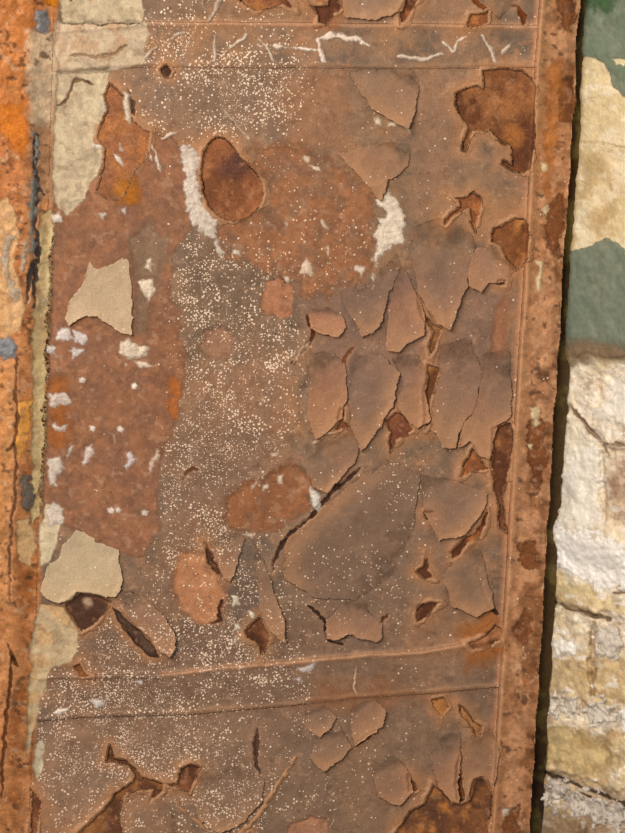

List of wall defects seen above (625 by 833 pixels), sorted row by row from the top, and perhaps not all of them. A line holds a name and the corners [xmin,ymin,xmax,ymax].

peeling [582,0,625,97]
rust [0,104,28,153]
peeling [454,66,540,177]
rust [543,61,563,197]
peeling [565,238,625,349]
peeling [0,0,192,778]
peeling [172,136,535,655]
crack [272,467,361,570]
crack [214,599,223,623]
crack [308,605,344,645]
peeling [70,744,265,833]
peeling [371,695,501,833]